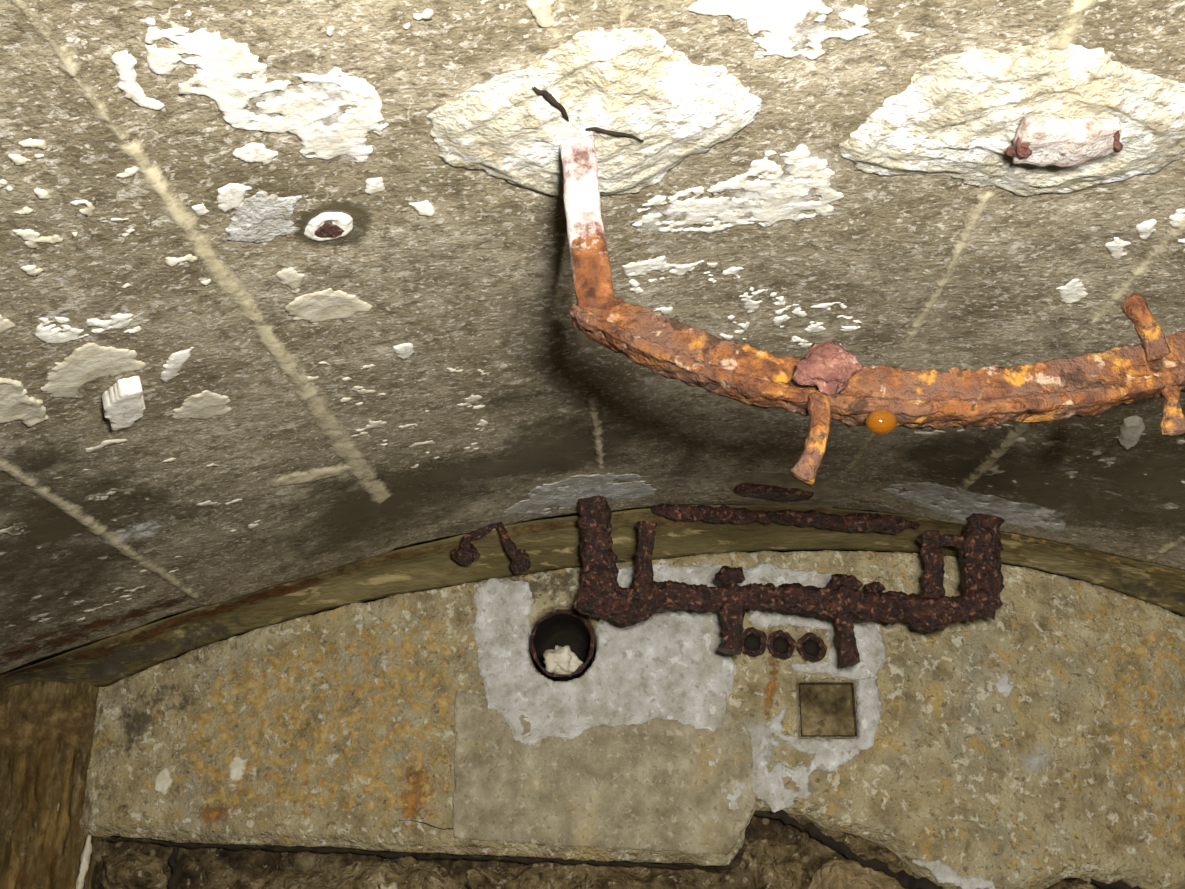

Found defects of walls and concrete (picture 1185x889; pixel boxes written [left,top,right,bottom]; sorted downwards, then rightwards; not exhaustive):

peeling [403,9,434,30]
peeling [683,0,869,61]
peeling [111,18,389,166]
peeling [629,144,844,233]
peeling [160,347,194,383]
peeling [0,313,146,454]
peeling [172,390,232,419]
peeling [84,488,134,501]
peeling [196,499,243,508]
peeling [0,523,27,536]
peeling [58,562,151,623]
peeling [8,613,54,628]